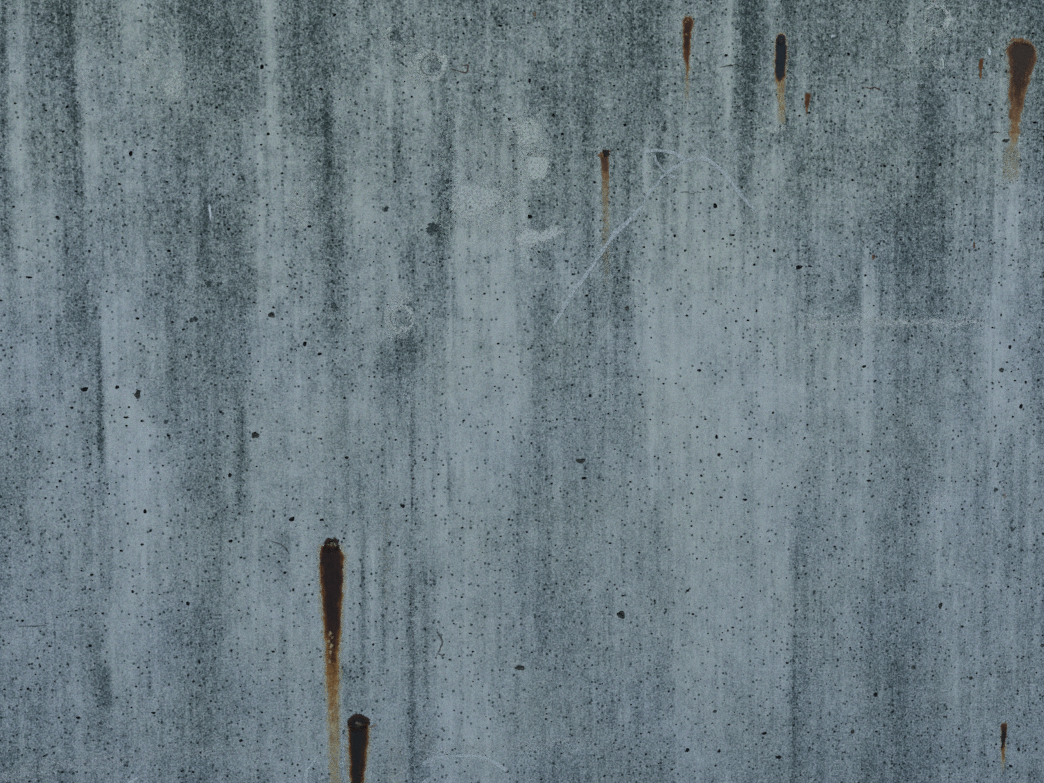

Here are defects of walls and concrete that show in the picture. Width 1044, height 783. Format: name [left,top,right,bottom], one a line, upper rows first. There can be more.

corrosion [682,16,695,95]
corrosion [772,32,788,122]
corrosion [1003,38,1038,181]
water stain [425,220,445,236]
corrosion [598,150,610,271]
corrosion [317,537,377,783]
corrosion [1000,722,1008,769]